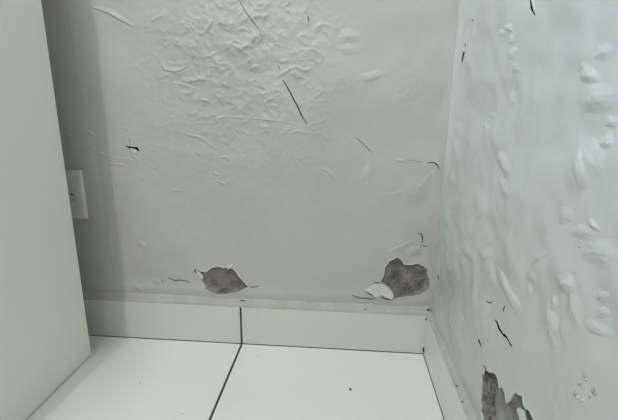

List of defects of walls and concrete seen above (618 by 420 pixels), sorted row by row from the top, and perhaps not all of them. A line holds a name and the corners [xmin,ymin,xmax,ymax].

crack [240,0,262,36]
crack [277,64,307,124]
spalling [192,264,259,296]
spalling [352,257,431,300]
crack [495,318,512,347]
spalling [480,363,536,420]